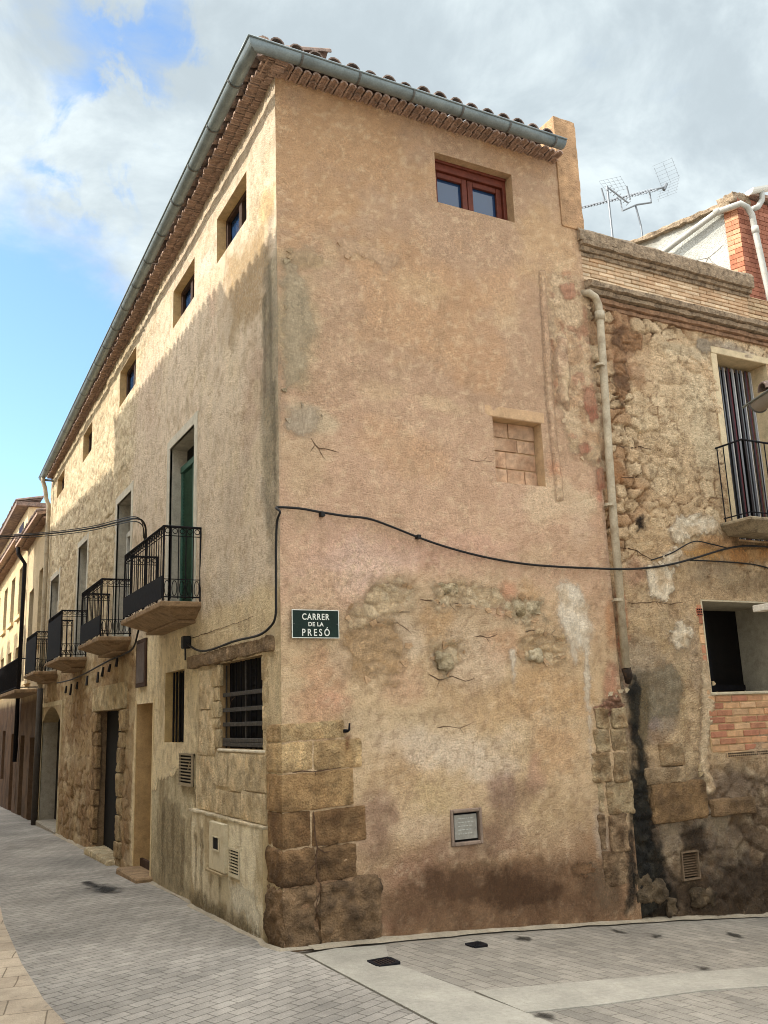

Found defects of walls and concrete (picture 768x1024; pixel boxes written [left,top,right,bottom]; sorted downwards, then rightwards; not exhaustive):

spalling [612,325,643,406]
spalling [341,577,415,687]
spalling [430,638,466,678]
spalling [432,580,566,667]
damp [556,582,592,728]
damp [386,674,768,936]